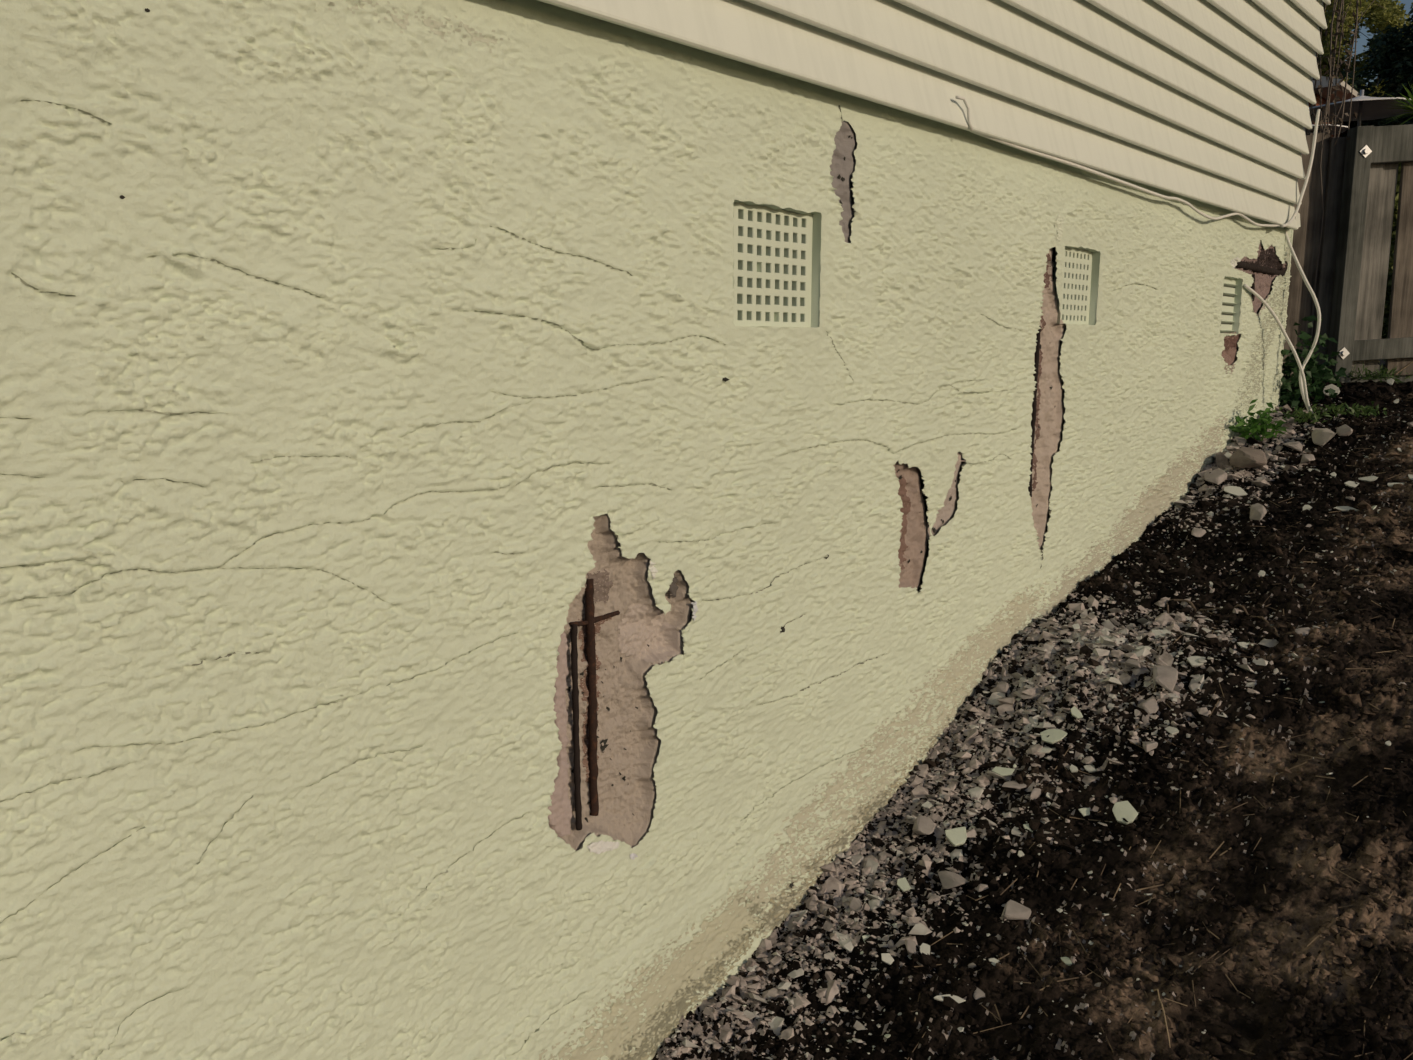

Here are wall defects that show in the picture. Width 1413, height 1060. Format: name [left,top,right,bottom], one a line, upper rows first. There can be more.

spalling [830,121,856,243]
crack [11,272,75,297]
crack [154,254,323,298]
crack [437,226,633,276]
spalling [1230,240,1287,313]
crack [87,408,227,416]
crack [399,310,726,438]
spalling [1028,248,1065,550]
crack [1,462,671,604]
spalling [893,451,967,590]
spalling [548,514,698,860]
peeling [709,593,1311,1043]